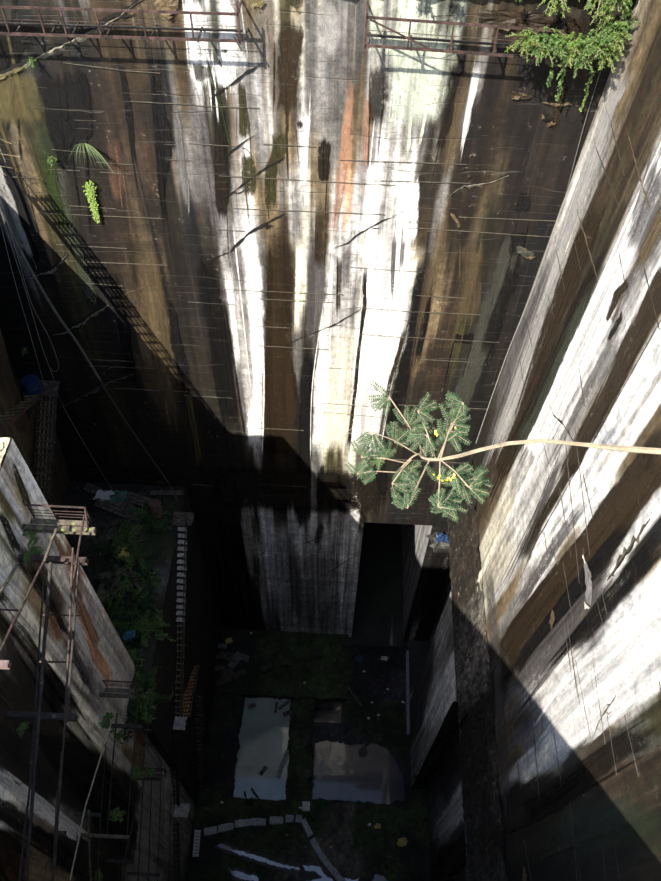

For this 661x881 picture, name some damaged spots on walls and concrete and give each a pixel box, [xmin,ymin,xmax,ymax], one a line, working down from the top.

water stain [57,74,90,226]
corrosion [333,103,352,219]
crack [211,214,284,260]
water stain [183,0,432,519]
crack [333,211,403,249]
crack [607,519,650,581]